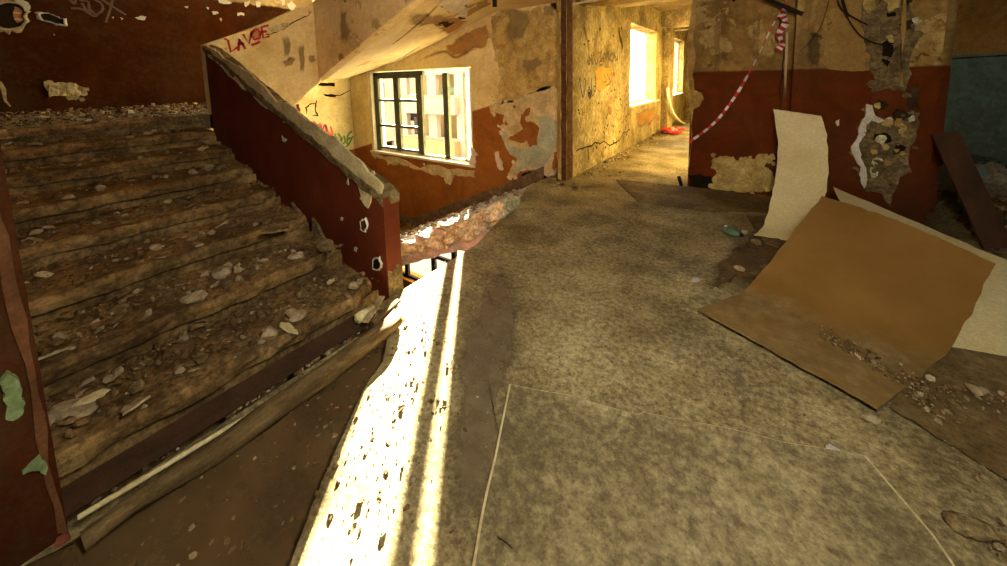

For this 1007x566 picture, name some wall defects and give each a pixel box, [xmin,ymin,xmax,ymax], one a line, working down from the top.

flaking render [13,7,24,23]
peeling [207,0,261,20]
flaking render [44,80,89,102]
peeling [439,0,558,180]
flaking render [821,0,924,208]
flaking render [708,153,776,194]
peeling [975,162,1007,197]
peeling [0,215,71,549]